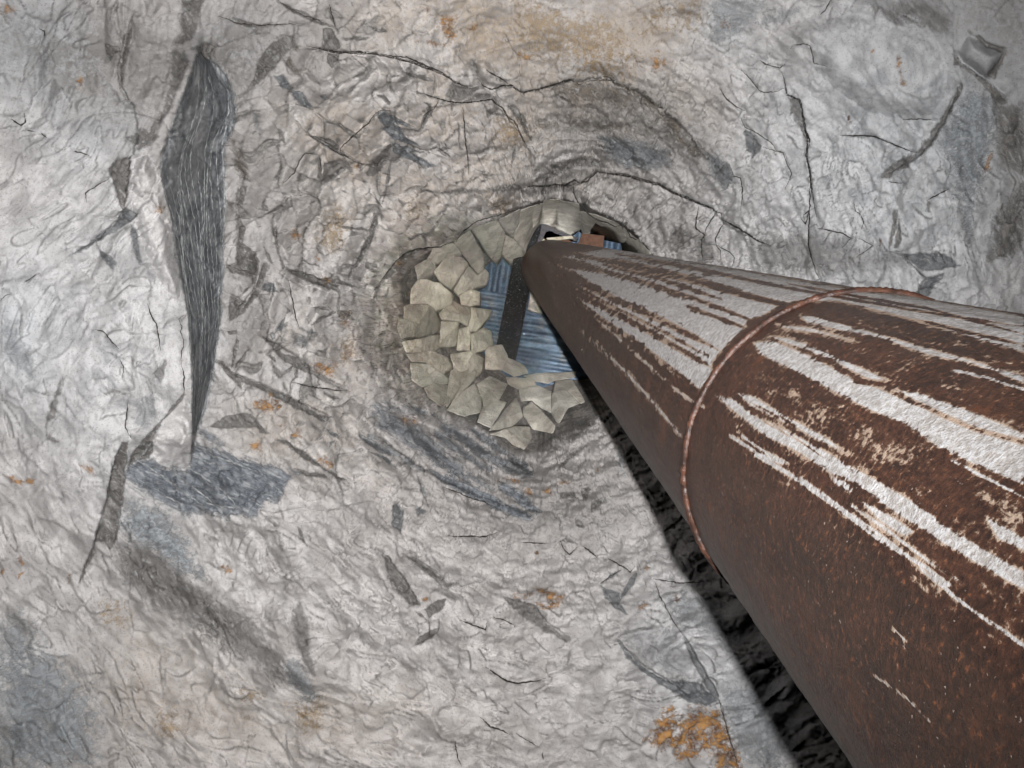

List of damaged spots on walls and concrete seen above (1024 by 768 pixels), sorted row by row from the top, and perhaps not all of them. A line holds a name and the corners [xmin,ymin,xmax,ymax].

crack [218,0,615,182]
crack [720,43,873,279]
crack [840,135,916,153]
corrosion [645,706,741,768]